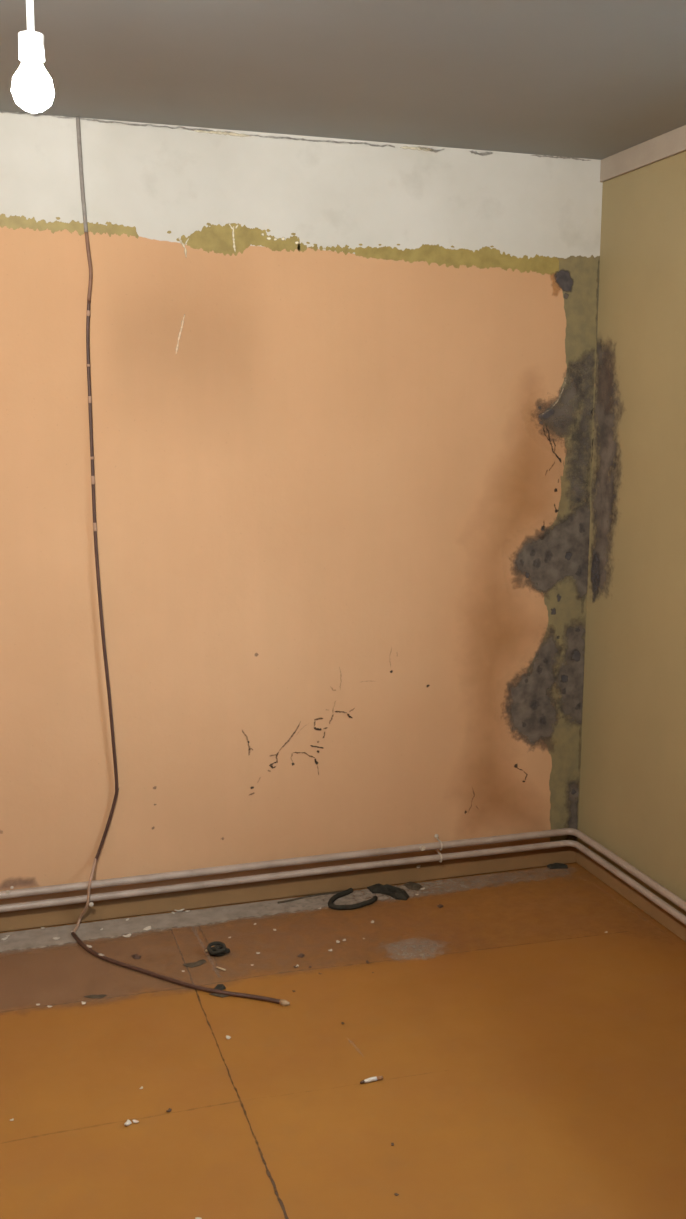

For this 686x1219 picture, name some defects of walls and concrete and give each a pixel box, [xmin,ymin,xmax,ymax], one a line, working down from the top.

peeling [0,214,139,239]
peeling [167,223,600,534]
damp [513,341,622,615]
damp [506,623,585,750]
peeling [528,576,588,842]